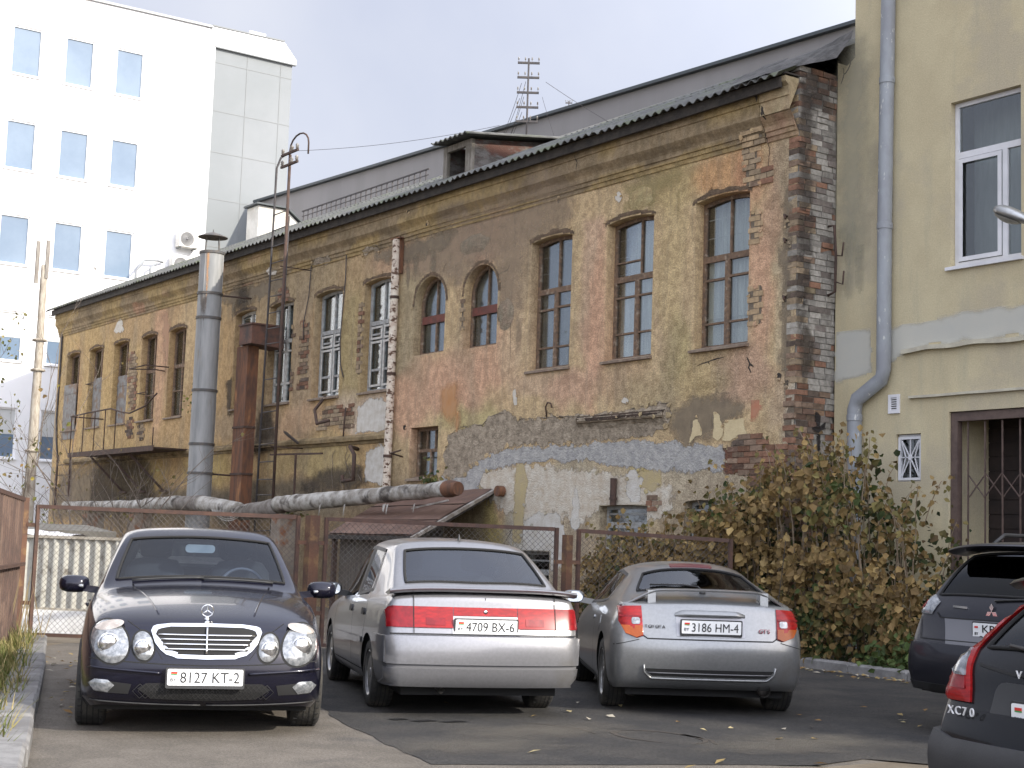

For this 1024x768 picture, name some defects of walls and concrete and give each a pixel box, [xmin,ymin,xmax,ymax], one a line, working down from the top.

flaking render [739,125,774,187]
flaking render [746,284,764,327]
flaking render [125,351,145,441]
flaking render [289,320,310,391]
peeling [316,397,386,486]
flaking render [439,389,796,570]